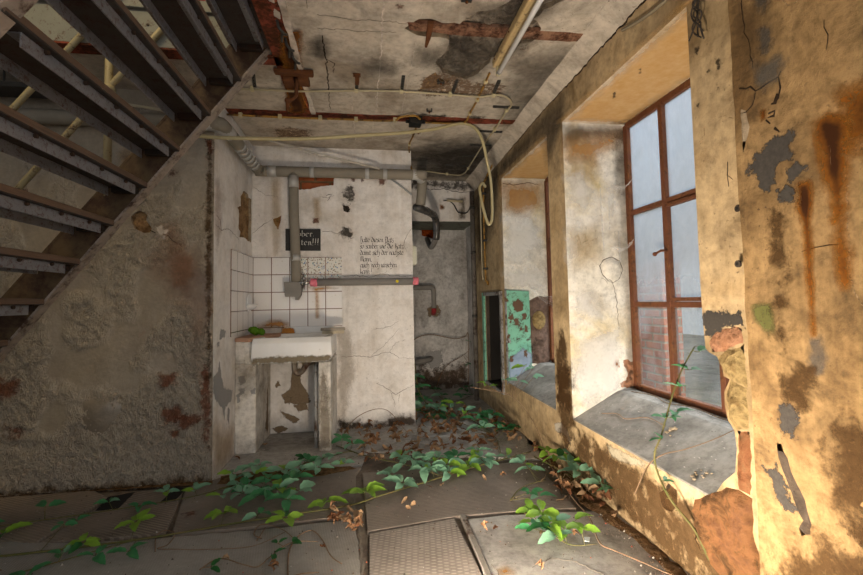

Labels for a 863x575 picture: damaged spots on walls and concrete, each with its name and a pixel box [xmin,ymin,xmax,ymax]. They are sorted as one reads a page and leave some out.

crack [306,0,403,109]
spalling [238,193,249,241]
crack [599,257,623,324]
peeling [745,127,809,205]
corrosion [795,181,816,336]
corrosion [813,81,863,289]
flaking render [161,361,256,448]
peeling [265,368,311,433]
spalling [692,310,812,575]
water stain [779,417,863,575]